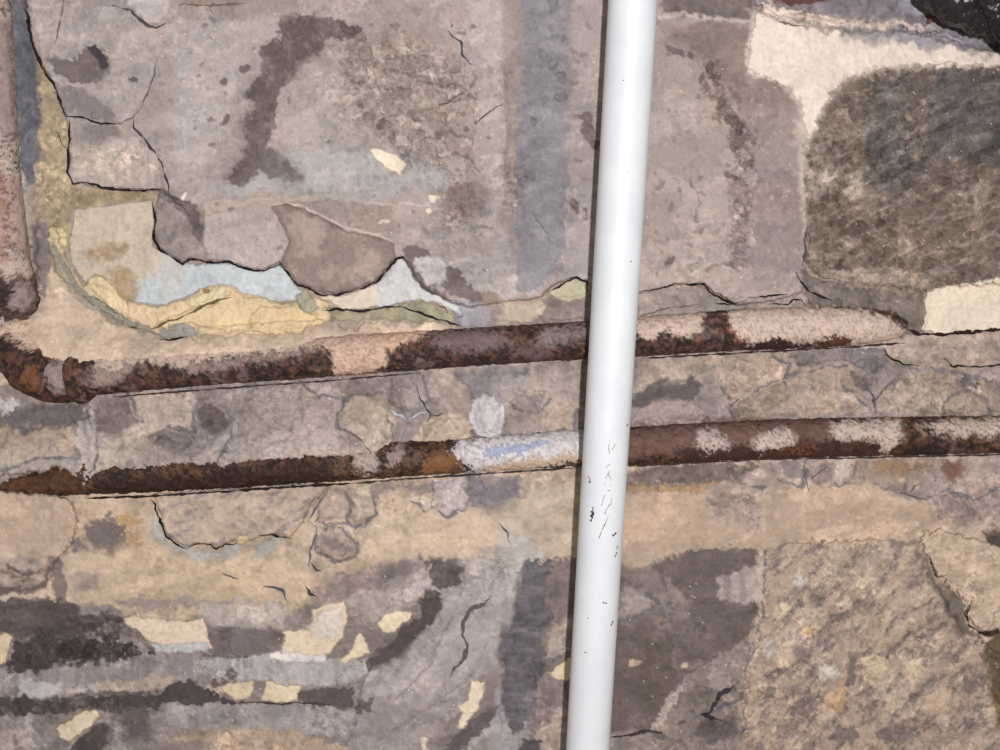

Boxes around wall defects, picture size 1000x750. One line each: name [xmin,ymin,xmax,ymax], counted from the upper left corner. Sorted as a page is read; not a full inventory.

crack [24,3,461,326]
damp [219,15,447,197]
damp [502,0,569,291]
spalling [47,201,461,338]
peeling [549,278,589,302]
corrosion [627,460,759,494]
corrosion [629,416,830,460]
corrosion [942,460,964,479]
crack [88,467,578,601]
crack [450,597,491,678]
crack [966,606,990,635]